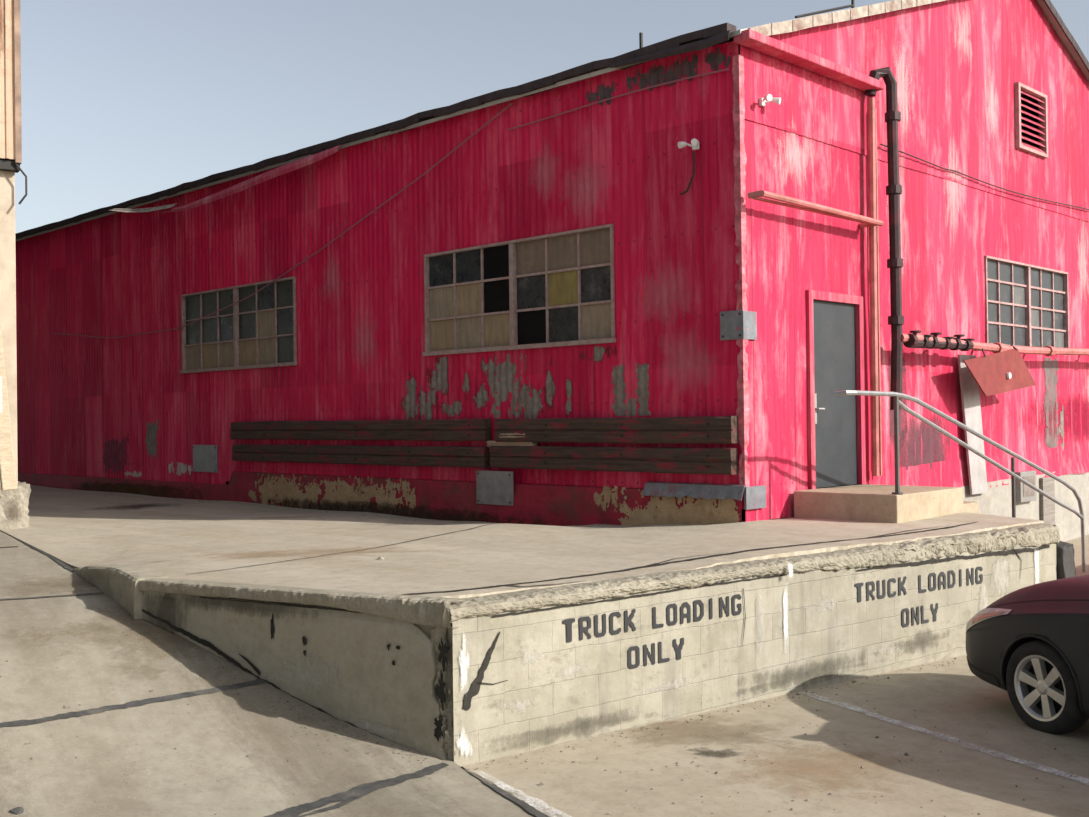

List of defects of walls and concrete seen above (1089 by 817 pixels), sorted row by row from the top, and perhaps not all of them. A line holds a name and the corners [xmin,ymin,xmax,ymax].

peeling [401,354,573,420]
peeling [579,345,651,416]
peeling [248,473,416,509]
peeling [594,485,740,526]
crack [857,545,1050,577]
crack [401,522,975,710]